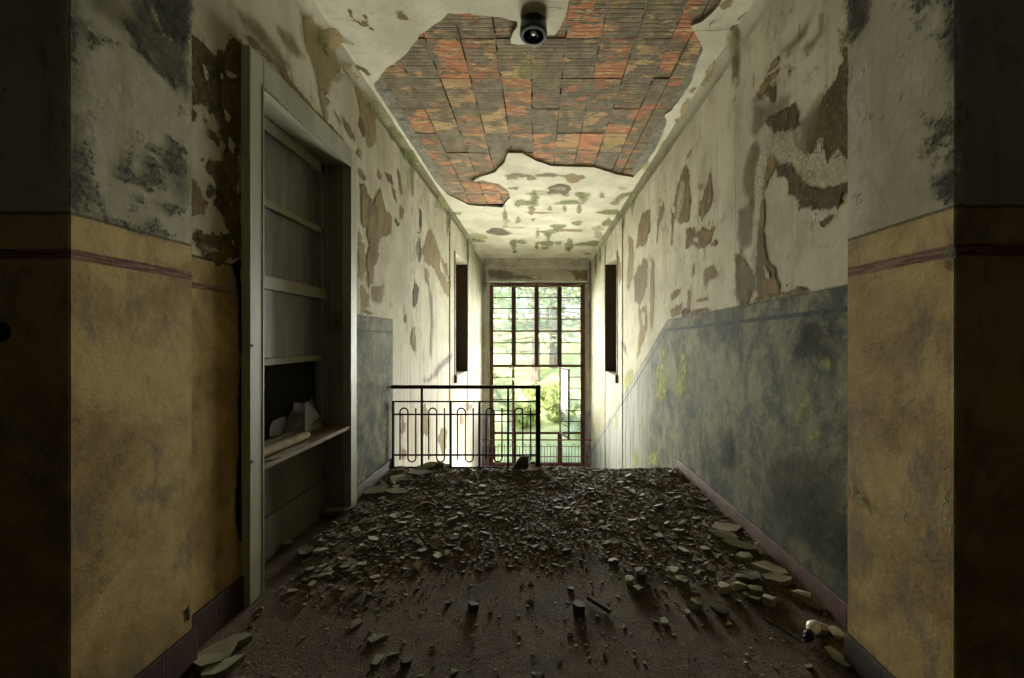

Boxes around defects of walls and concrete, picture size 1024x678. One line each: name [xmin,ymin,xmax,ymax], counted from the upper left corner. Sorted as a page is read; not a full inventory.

damp [66,131,188,240]
damp [96,0,196,97]
peeling [187,18,404,542]
spalling [343,0,733,204]
peeling [616,149,716,357]
peeling [739,155,848,307]
peeling [752,28,848,163]
damp [903,0,963,80]
damp [920,108,961,206]